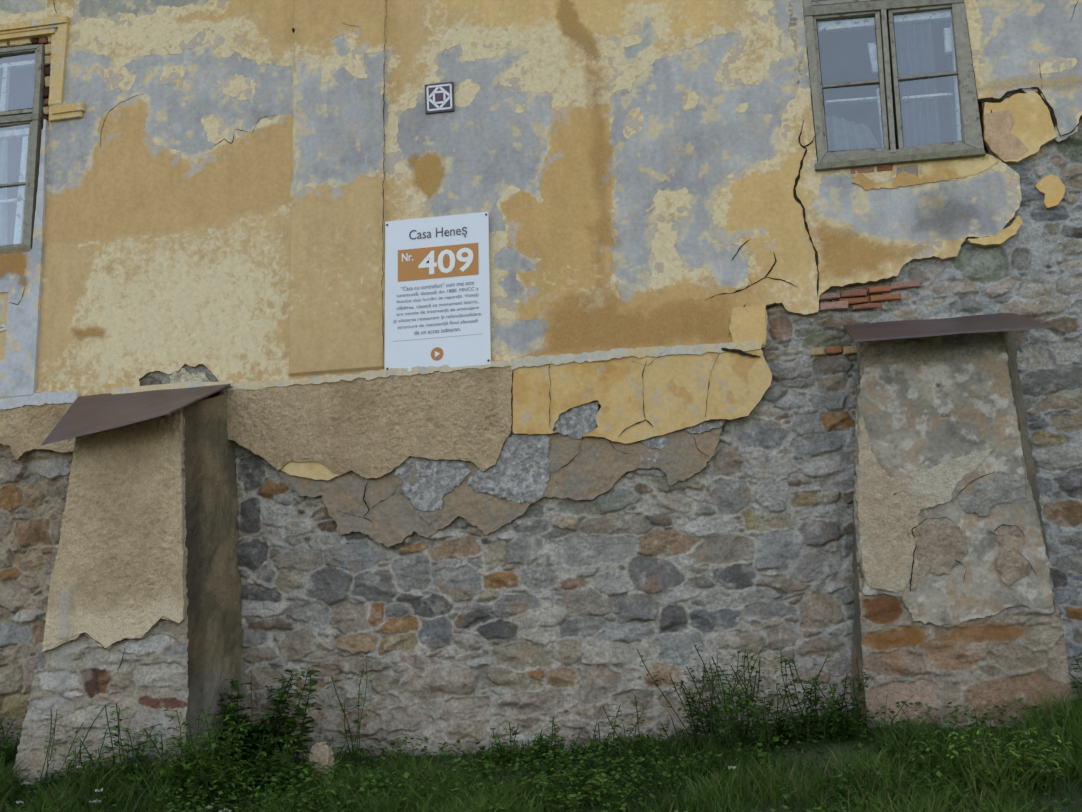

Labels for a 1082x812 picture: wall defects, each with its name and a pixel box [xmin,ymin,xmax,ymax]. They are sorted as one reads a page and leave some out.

peeling [73,0,209,20]
leakage [558,0,598,57]
peeling [0,35,553,234]
peeling [609,0,811,290]
crack [706,120,819,307]
peeling [812,0,1082,247]
flaking render [819,281,920,312]
crack [337,482,399,522]
flaking render [279,401,725,548]
crack [609,352,663,456]
crack [693,334,760,456]
flaking render [857,415,993,592]